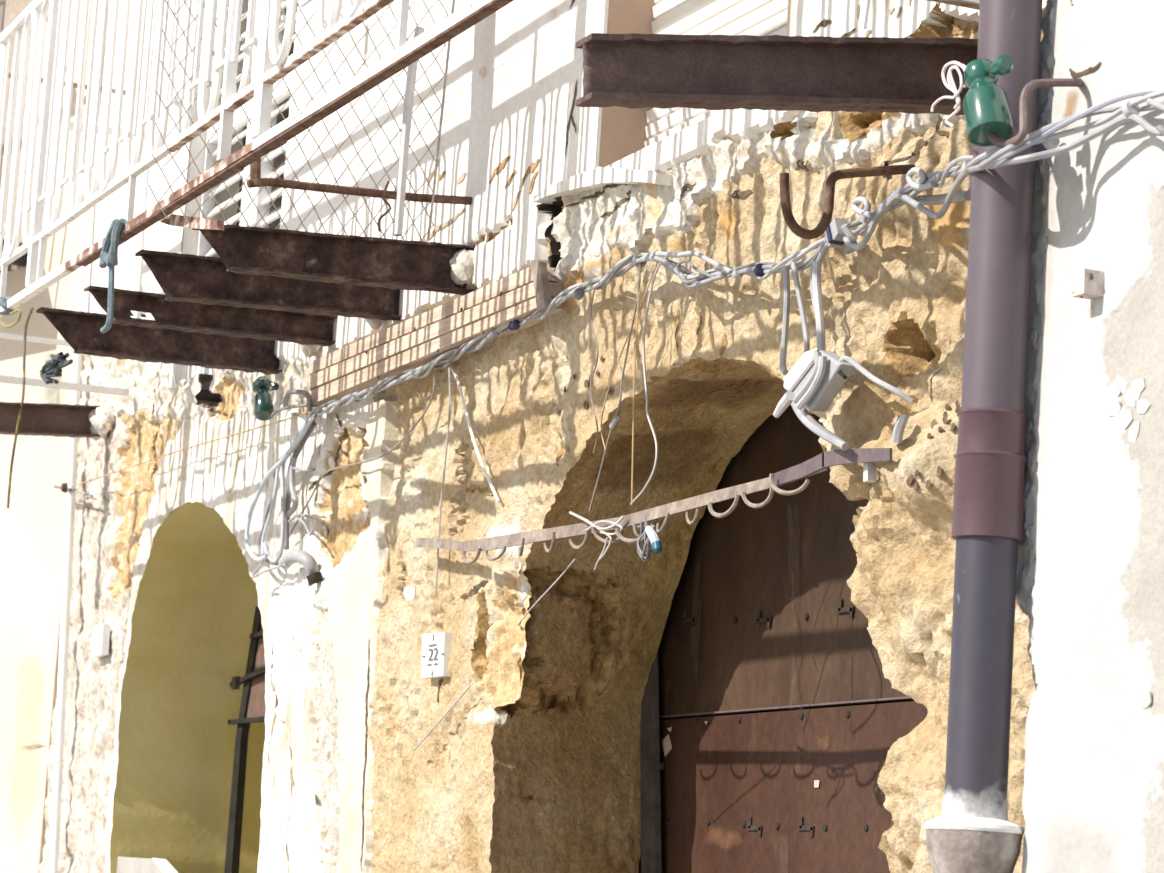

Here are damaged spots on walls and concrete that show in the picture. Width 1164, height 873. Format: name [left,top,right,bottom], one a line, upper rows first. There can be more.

spalling [770,121,797,140]
spalling [837,111,896,143]
spalling [1037,0,1056,130]
spalling [468,155,539,251]
spalling [879,311,942,386]
spalling [107,408,166,604]
spalling [447,441,474,542]
spalling [927,401,961,439]
spalling [1016,149,1052,691]
peeling [1102,187,1164,718]
flaking render [271,428,371,873]
spalling [460,566,624,718]